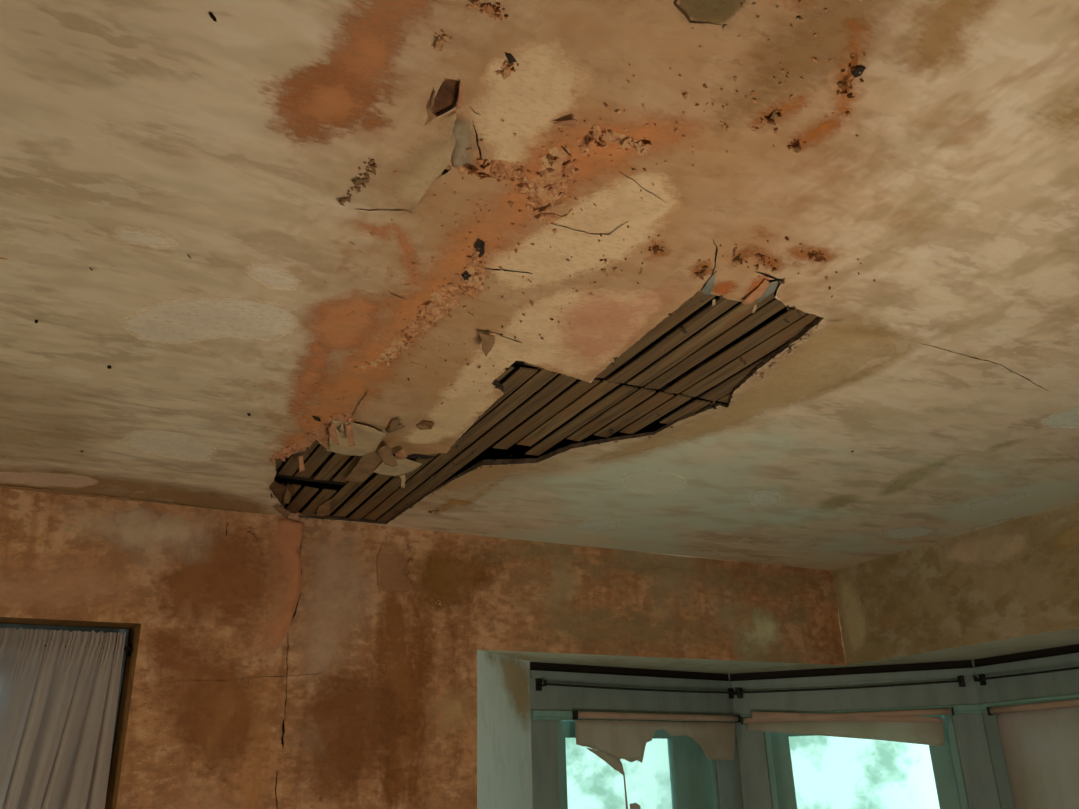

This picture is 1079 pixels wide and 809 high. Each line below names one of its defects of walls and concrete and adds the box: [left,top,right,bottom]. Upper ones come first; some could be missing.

spalling [497,53,517,79]
spalling [836,50,866,98]
spalling [396,78,652,224]
damp [417,0,874,382]
spalling [788,139,806,153]
spalling [269,412,356,472]
spalling [360,239,489,372]
damp [342,275,516,456]
damp [440,464,529,490]
damp [601,316,895,459]
crack [179,530,329,747]
damp [306,597,429,803]